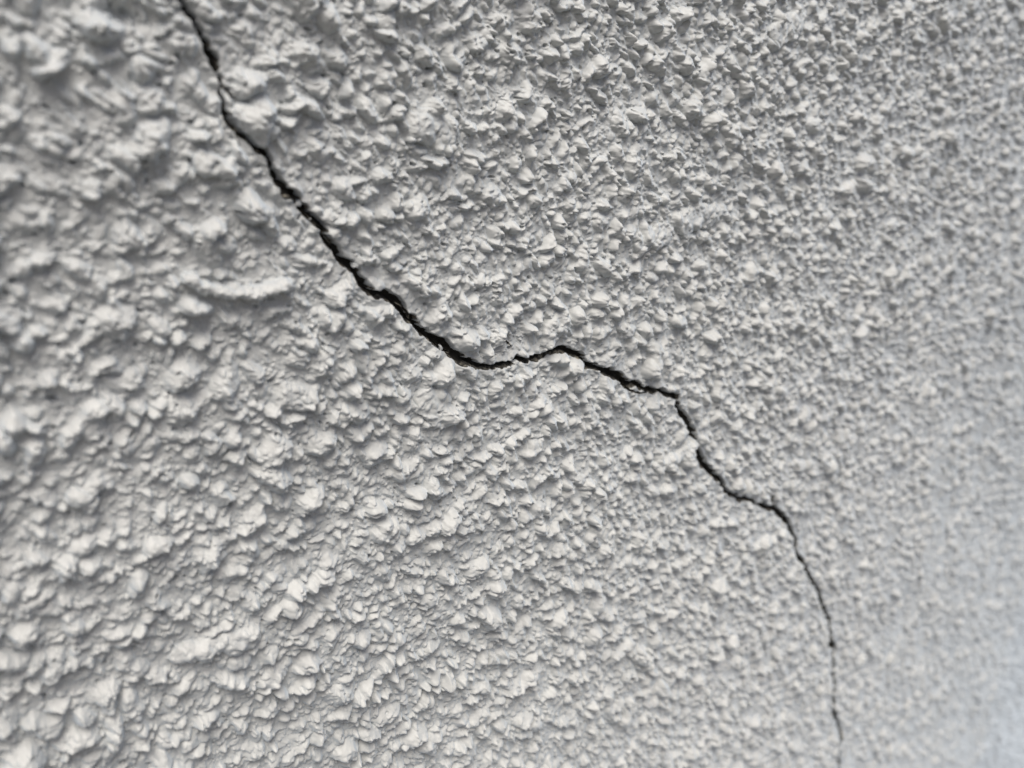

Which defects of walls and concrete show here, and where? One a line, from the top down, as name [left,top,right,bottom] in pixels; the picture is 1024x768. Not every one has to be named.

crack [177,0,843,768]